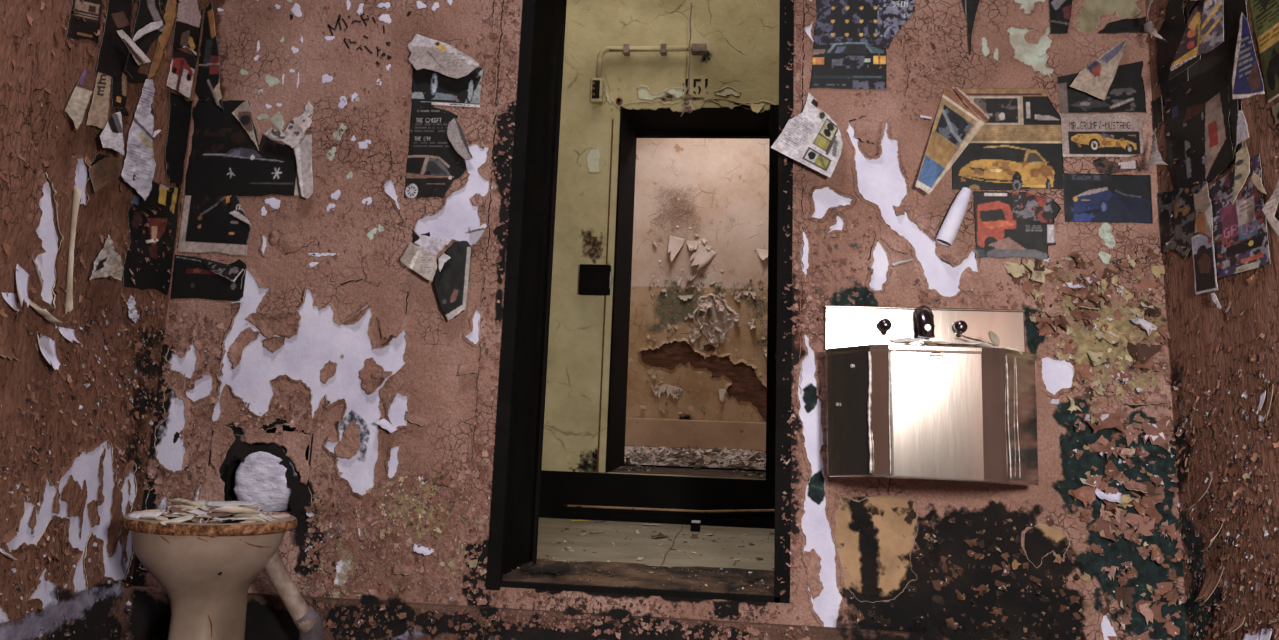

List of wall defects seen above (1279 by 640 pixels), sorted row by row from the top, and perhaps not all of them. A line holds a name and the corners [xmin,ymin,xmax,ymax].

peeling [851,16,963,122]
peeling [777,118,1279,640]
leakage [326,540,767,640]